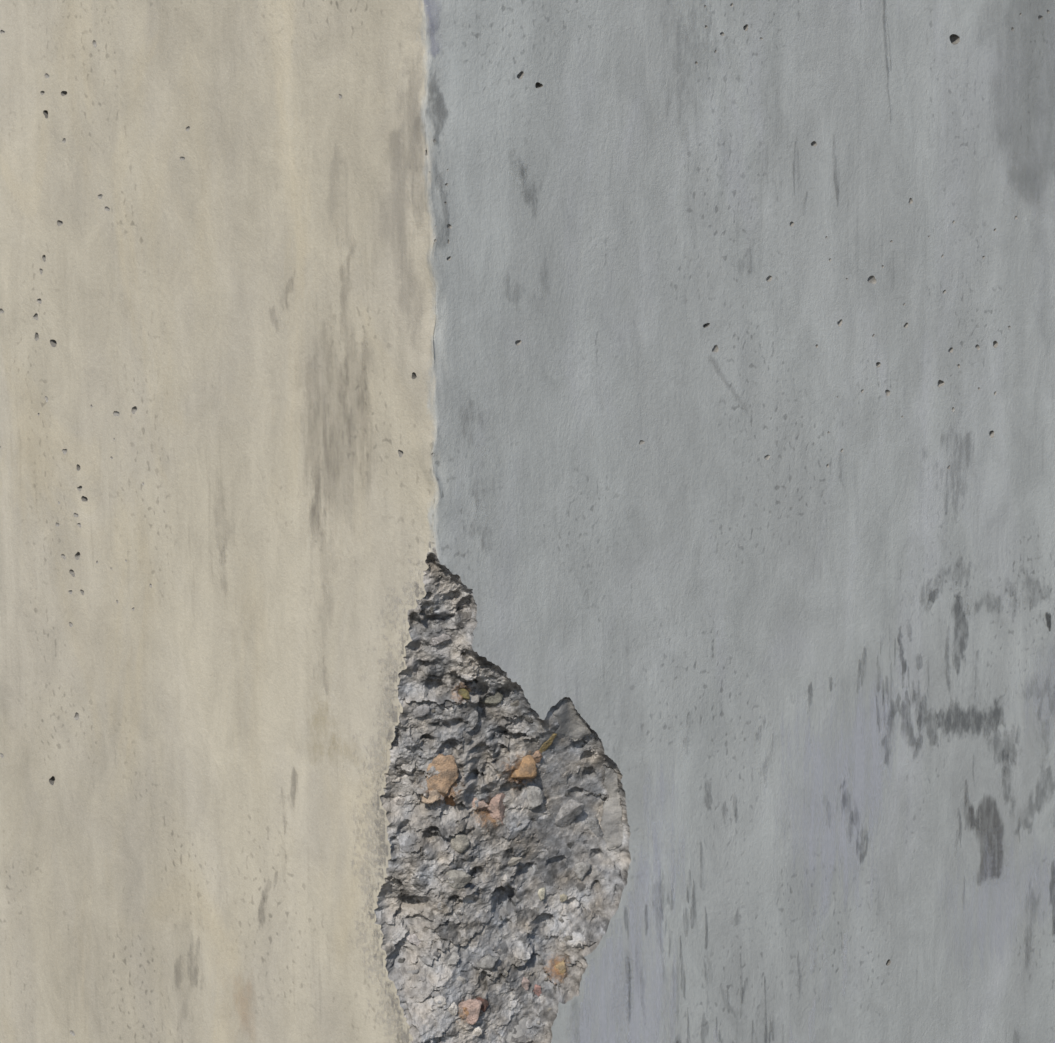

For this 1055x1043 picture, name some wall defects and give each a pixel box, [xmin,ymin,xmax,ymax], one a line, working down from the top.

spalling [370,544,631,1043]
leakage [970,801,1002,876]